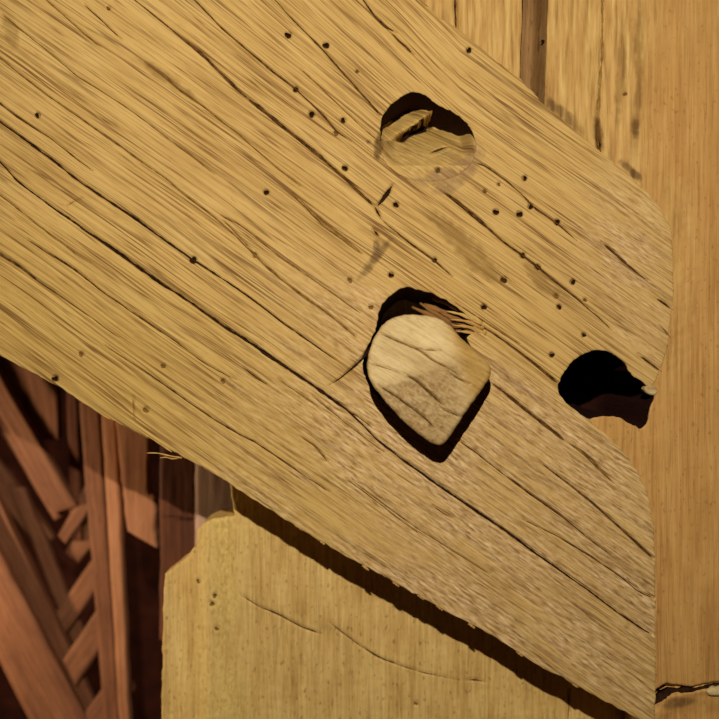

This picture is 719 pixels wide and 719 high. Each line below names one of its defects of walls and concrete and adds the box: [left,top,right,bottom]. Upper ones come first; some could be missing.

crack [0,57,362,337]
crack [135,0,452,276]
crack [0,103,652,633]
crack [243,596,484,682]
crack [655,682,719,703]